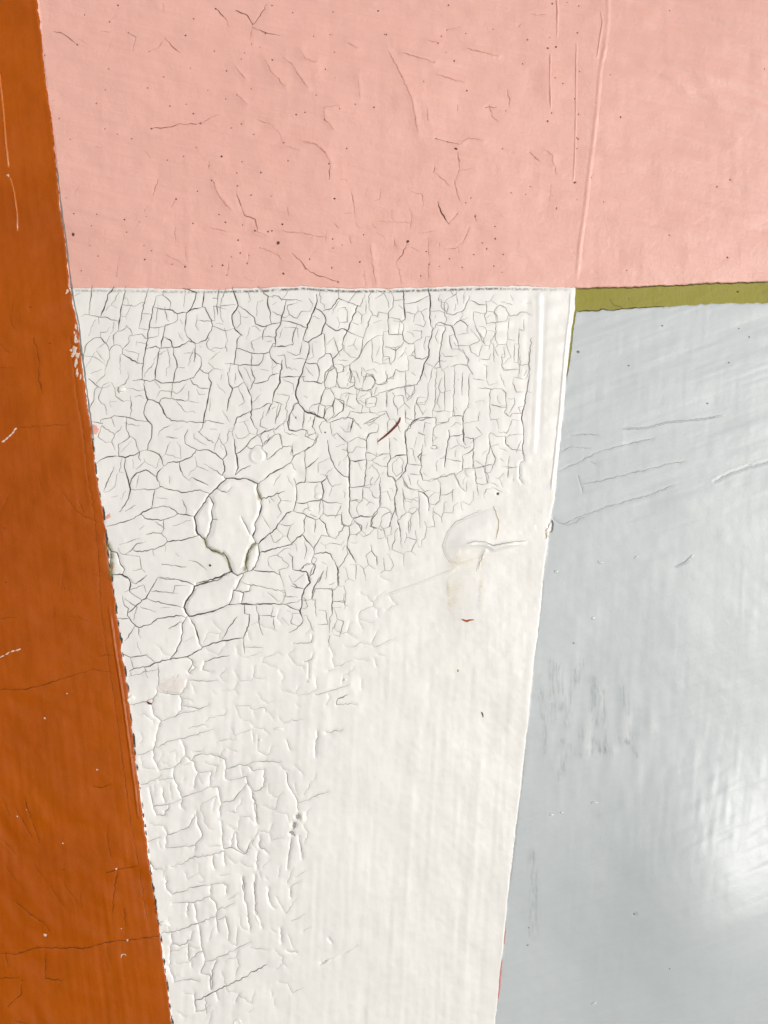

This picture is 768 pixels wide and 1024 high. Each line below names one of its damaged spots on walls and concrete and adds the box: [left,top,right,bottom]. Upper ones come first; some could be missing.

crack [0,26,532,1024]
crack [217,4,316,87]